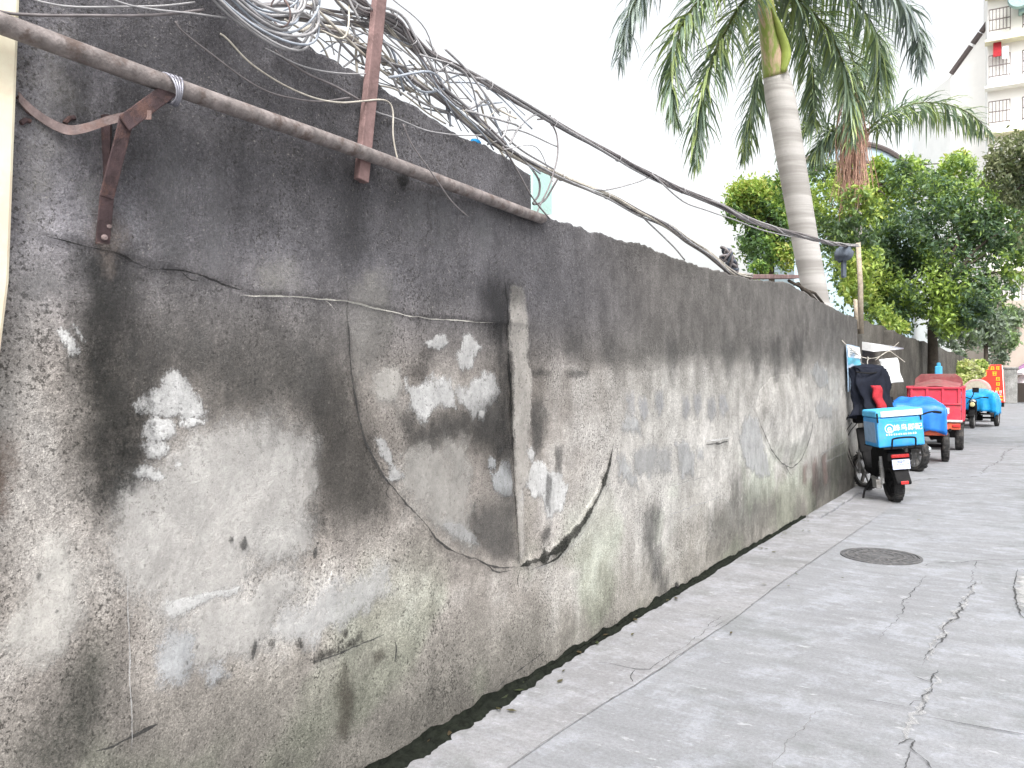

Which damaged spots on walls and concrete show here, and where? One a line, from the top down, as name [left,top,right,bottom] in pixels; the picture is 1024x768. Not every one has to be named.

damp [71,246,141,497]
crack [45,235,614,590]
damp [402,282,518,472]
damp [532,401,545,449]
crack [930,717,1022,734]